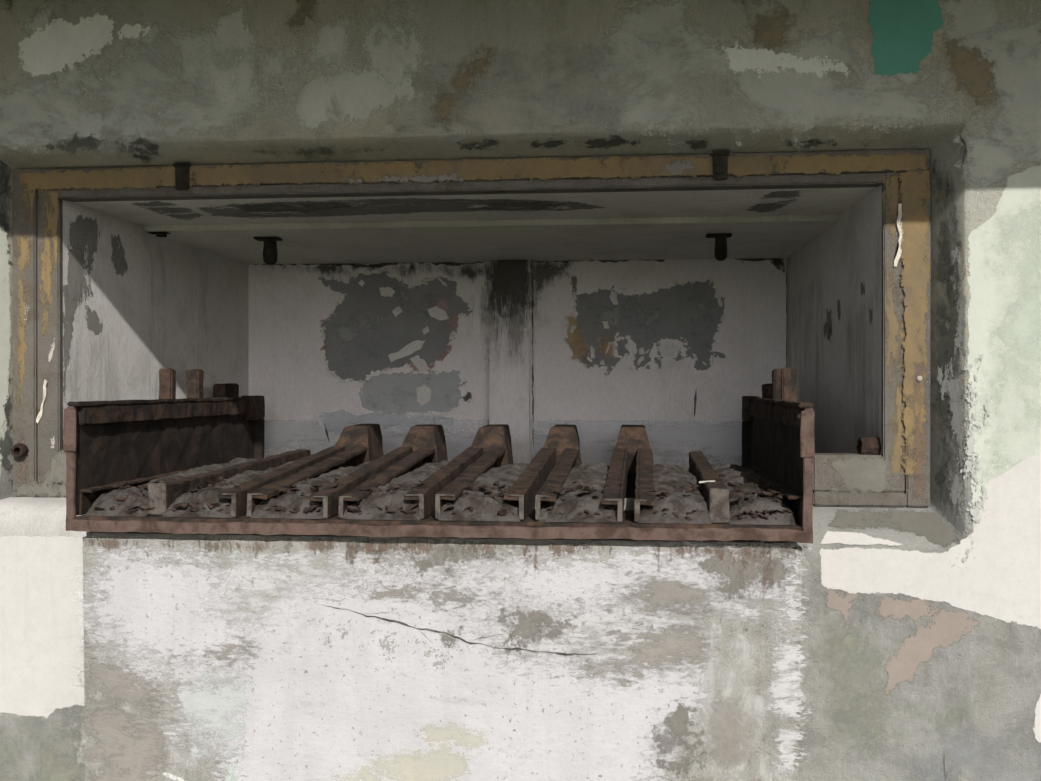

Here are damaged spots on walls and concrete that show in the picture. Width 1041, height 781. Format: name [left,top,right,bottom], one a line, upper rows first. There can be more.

peeling [48,215,128,400]
peeling [318,270,474,414]
damp [446,259,569,351]
peeling [565,276,725,376]
rust [89,536,119,550]
rust [309,538,433,564]
crack [325,605,597,659]